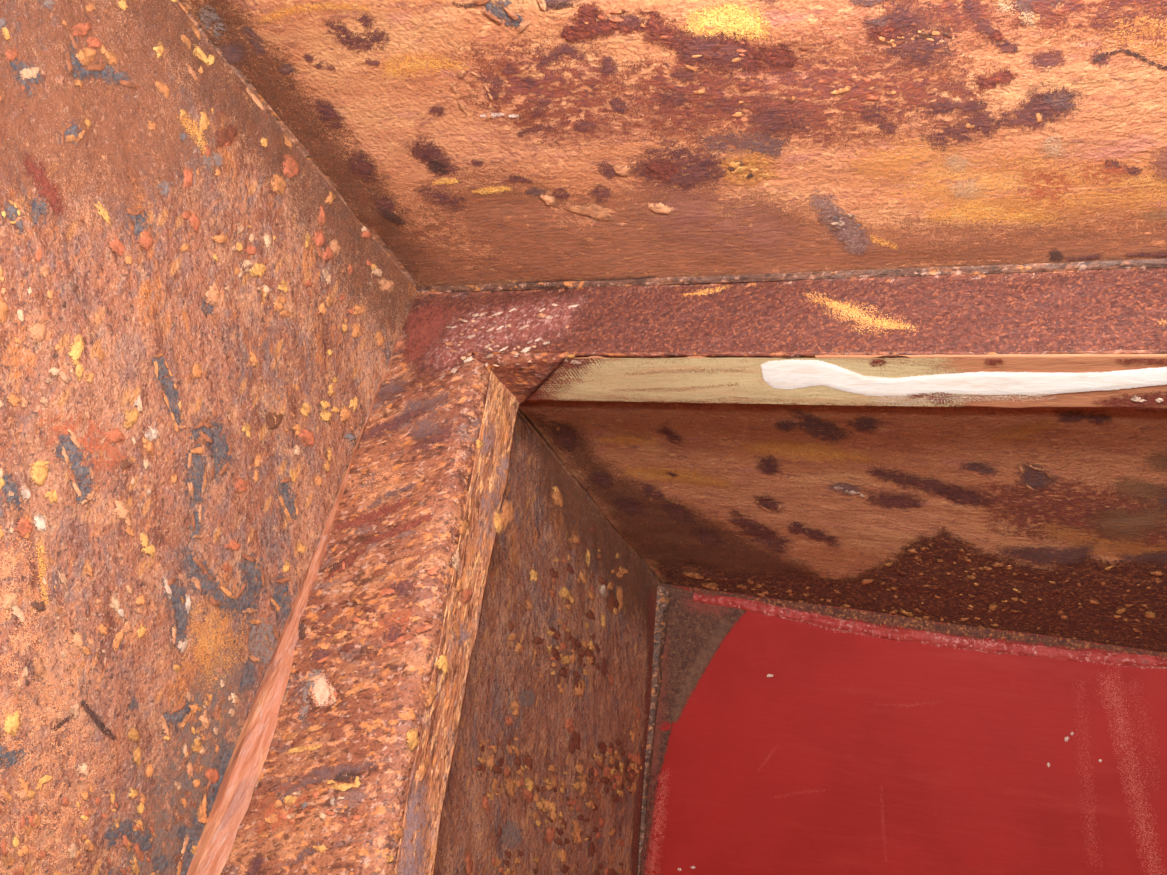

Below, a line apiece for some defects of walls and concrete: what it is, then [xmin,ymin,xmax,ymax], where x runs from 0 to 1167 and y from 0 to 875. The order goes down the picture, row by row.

corrosion [0,0,1167,486]
corrosion [0,266,255,875]
corrosion [234,451,262,493]
corrosion [283,543,306,573]
corrosion [317,569,433,654]
corrosion [334,483,432,547]
corrosion [406,550,473,604]
corrosion [284,668,366,754]
corrosion [424,655,449,707]
corrosion [472,461,1167,875]
corrosion [244,758,378,875]
corrosion [365,719,432,875]